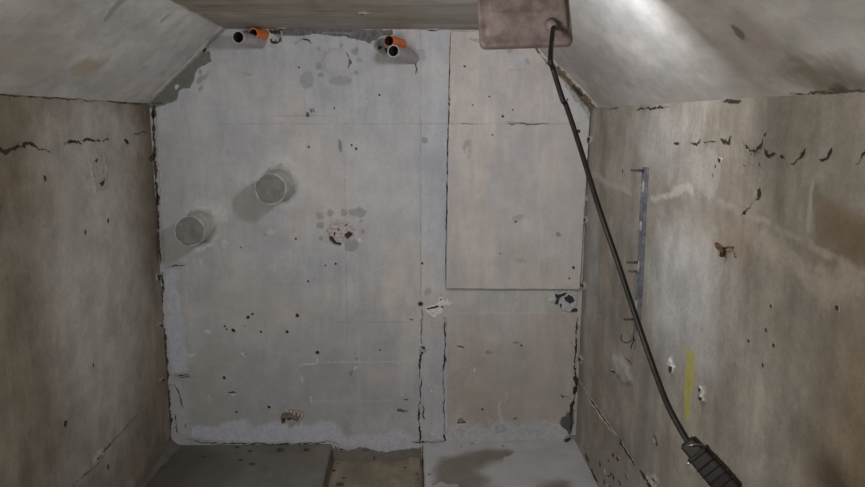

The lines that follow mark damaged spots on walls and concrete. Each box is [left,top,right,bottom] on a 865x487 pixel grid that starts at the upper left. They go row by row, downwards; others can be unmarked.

spalling [547,54,600,109]
crack [674,133,832,165]
spalling [326,218,363,245]
rust [704,211,768,285]
spalling [417,297,453,319]
spalling [548,281,587,313]
water stain [119,261,594,487]
crack [411,296,448,444]
crack [561,317,581,433]
spalling [279,409,304,424]